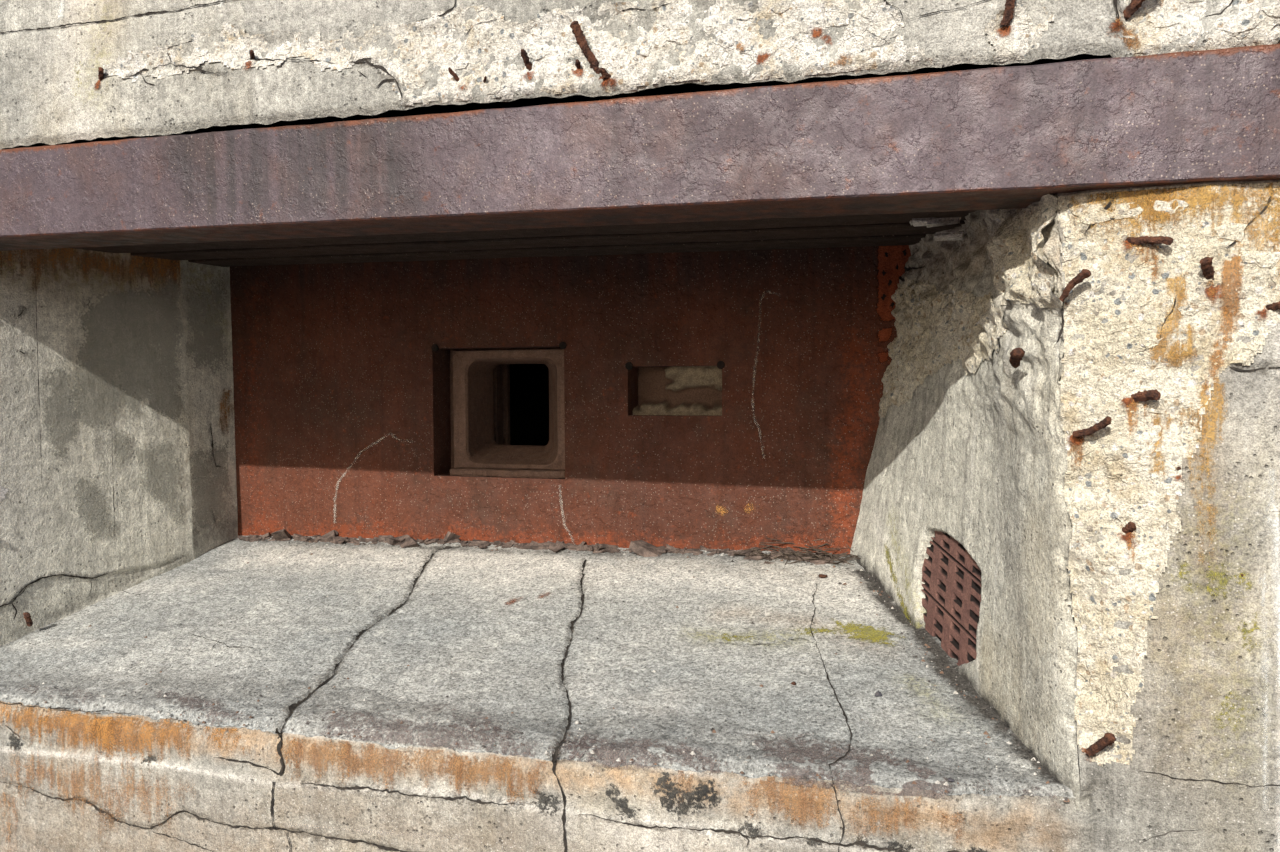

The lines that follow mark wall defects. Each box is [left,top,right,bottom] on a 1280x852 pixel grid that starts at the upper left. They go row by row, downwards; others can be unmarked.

spalling [103,0,934,106]
spalling [985,0,1054,62]
spalling [1117,0,1280,57]
rust [1069,183,1280,535]
crack [1230,365,1280,373]
spalling [876,182,1280,767]
crack [0,546,523,852]
crack [551,559,910,852]
rust [0,706,244,841]
rust [285,737,546,799]
rust [745,776,836,826]
crack [1142,771,1280,787]